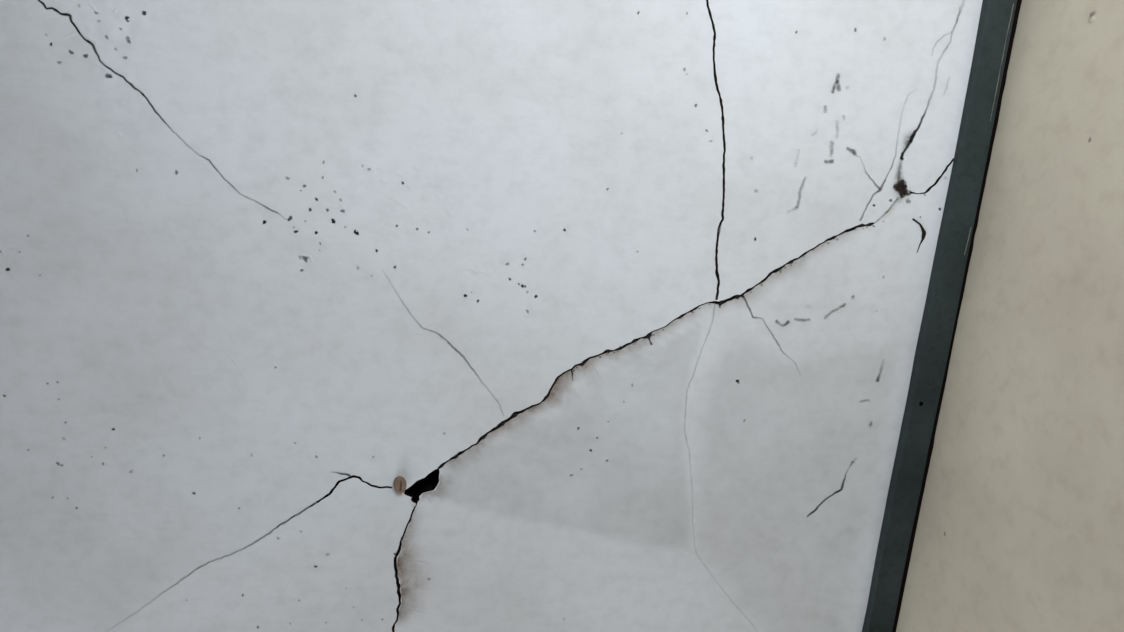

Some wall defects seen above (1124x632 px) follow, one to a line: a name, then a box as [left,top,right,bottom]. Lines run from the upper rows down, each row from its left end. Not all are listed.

crack [38,0,167,124]
crack [438,0,885,469]
crack [892,0,1022,632]
crack [247,472,392,547]
crack [392,500,418,632]
crack [807,476,846,517]